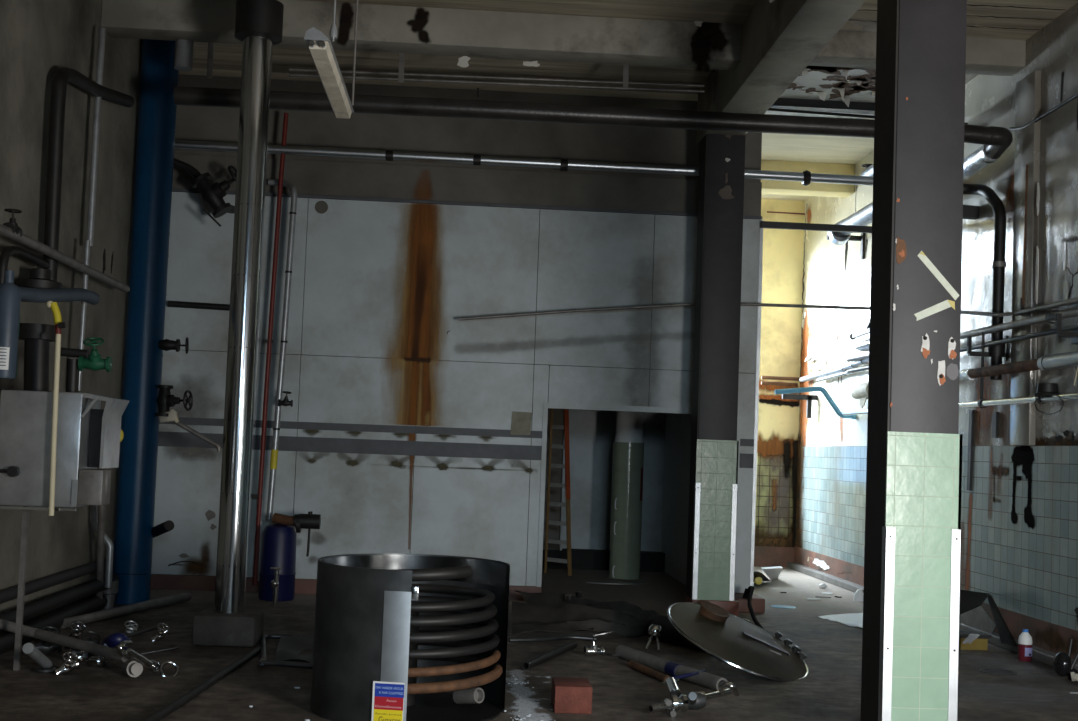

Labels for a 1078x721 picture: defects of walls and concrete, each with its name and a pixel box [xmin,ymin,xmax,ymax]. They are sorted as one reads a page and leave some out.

peeling [787,65,876,107]
corrosion [388,185,440,441]
corrosion [759,311,814,446]
leakage [754,434,804,548]